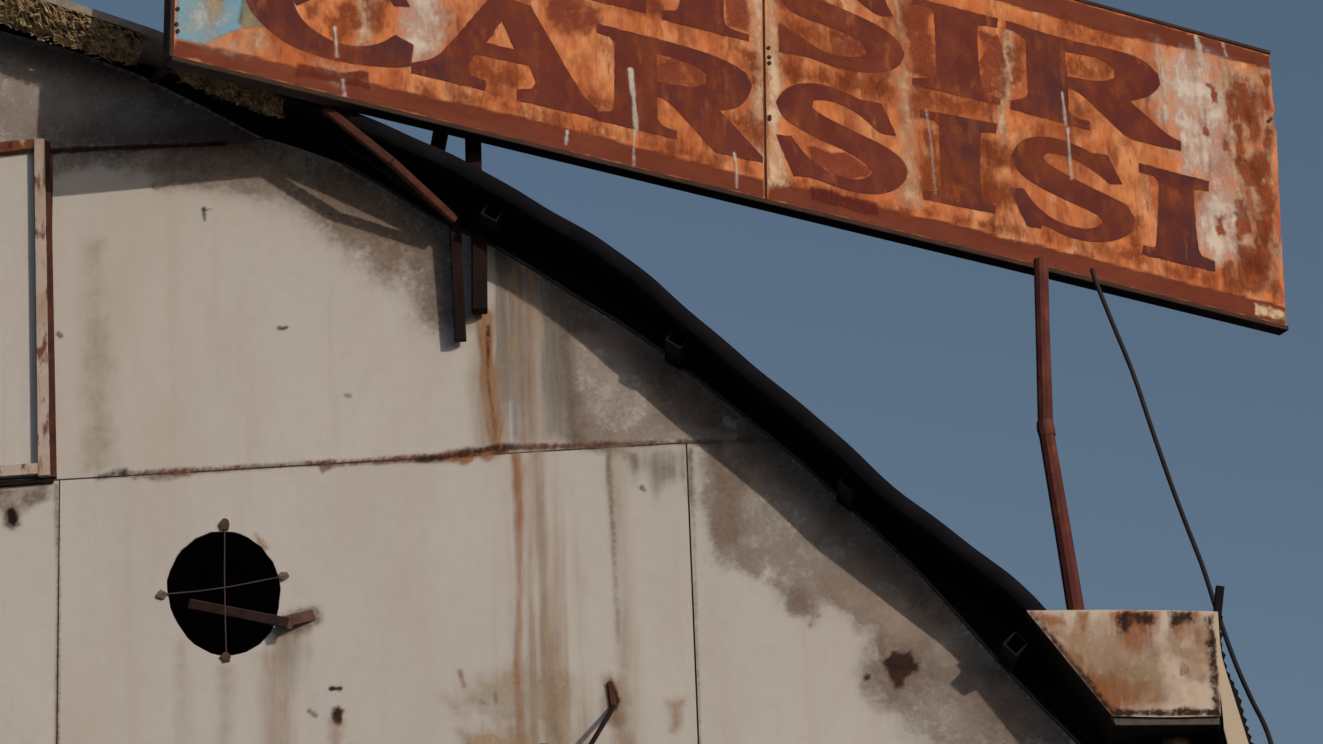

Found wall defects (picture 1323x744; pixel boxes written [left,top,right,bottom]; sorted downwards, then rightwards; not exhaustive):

rust [51,140,228,154]
damp [0,37,453,318]
rust [99,311,719,535]
damp [497,251,1069,744]
spalling [865,644,936,696]
rust [1036,611,1221,716]